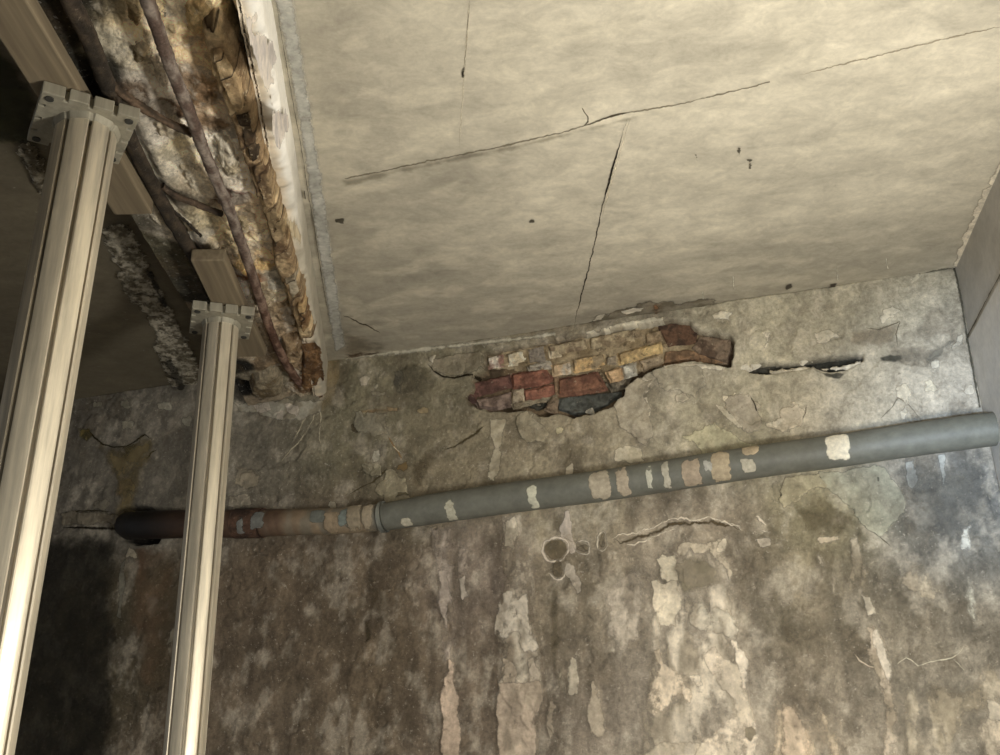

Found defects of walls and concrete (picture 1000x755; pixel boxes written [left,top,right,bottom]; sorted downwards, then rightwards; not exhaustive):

spalling [37,0,102,98]
crack [806,27,999,74]
spalling [82,0,325,406]
rust [202,7,317,339]
crack [345,5,769,321]
flaking render [429,324,862,454]
crack [615,516,769,546]
water stain [15,539,114,755]